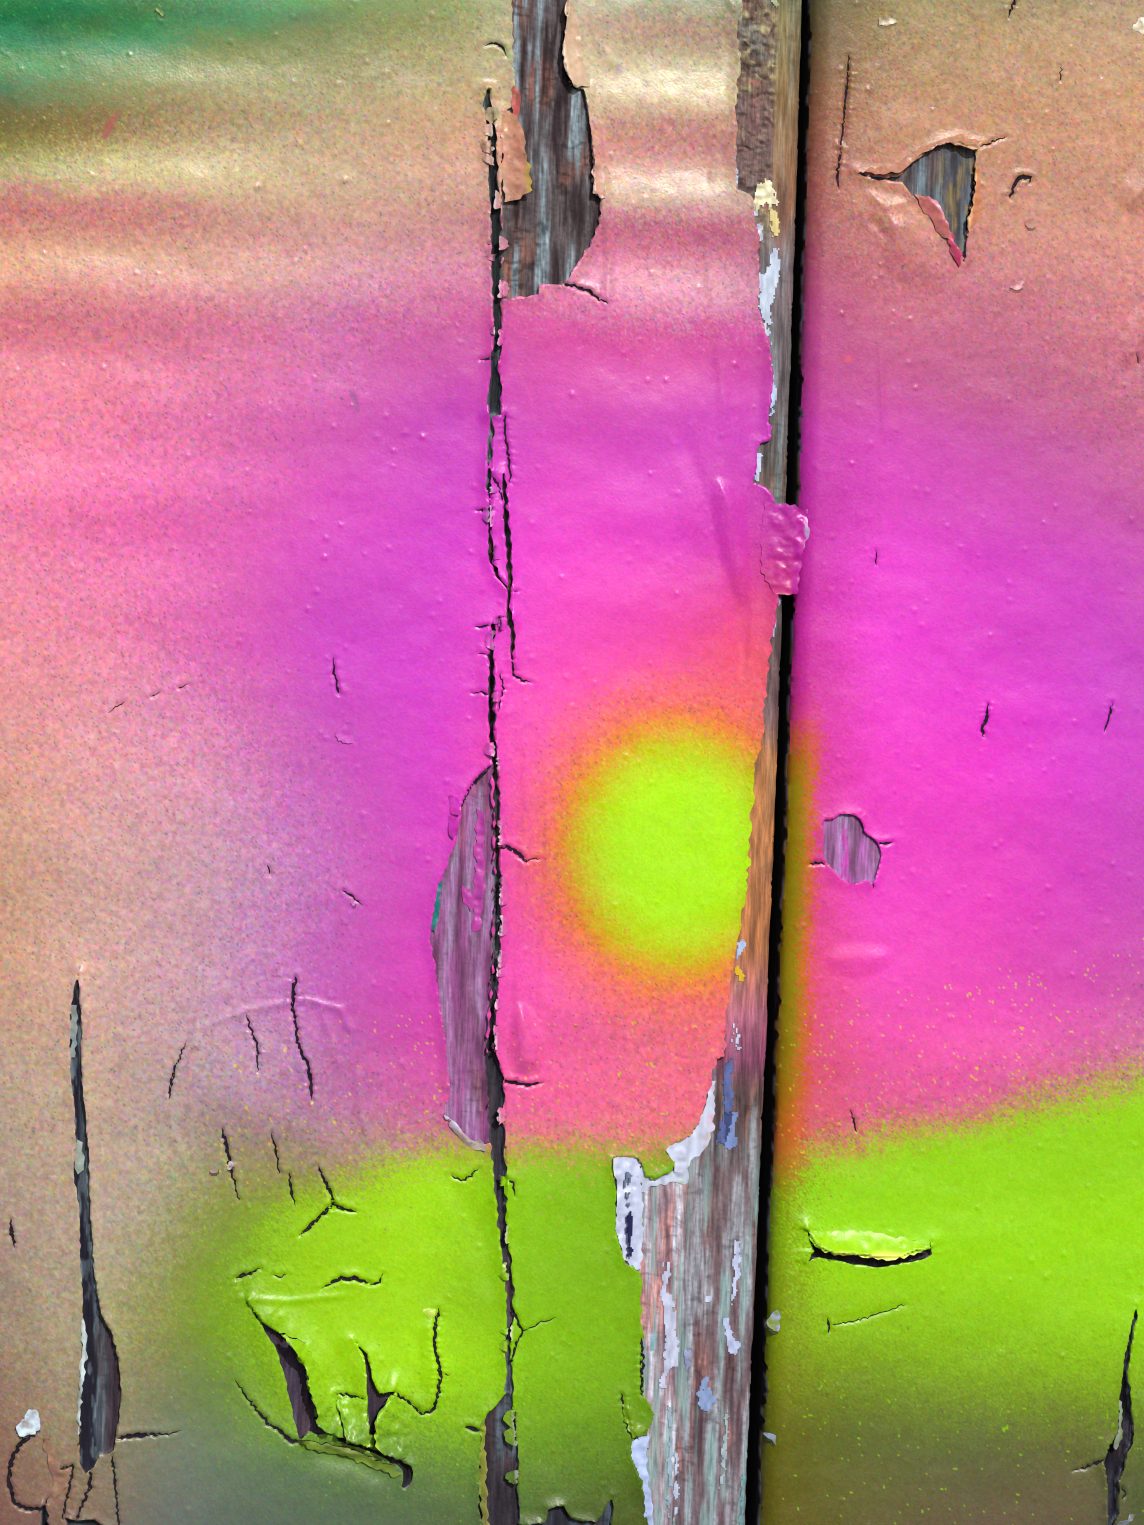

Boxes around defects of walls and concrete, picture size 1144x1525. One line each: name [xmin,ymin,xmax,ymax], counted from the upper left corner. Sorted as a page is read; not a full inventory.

peeling [485,0,608,304]
peeling [859,134,1005,267]
crack [291,977,313,1100]
peeling [430,765,495,1151]
crack [465,89,556,1525]
peeling [613,0,810,1525]
peeling [810,814,892,889]
crack [69,980,181,1525]
crack [222,1128,240,1200]
crack [271,1133,356,1234]
peeling [235,1308,448,1488]
crack [1072,1312,1136,1525]